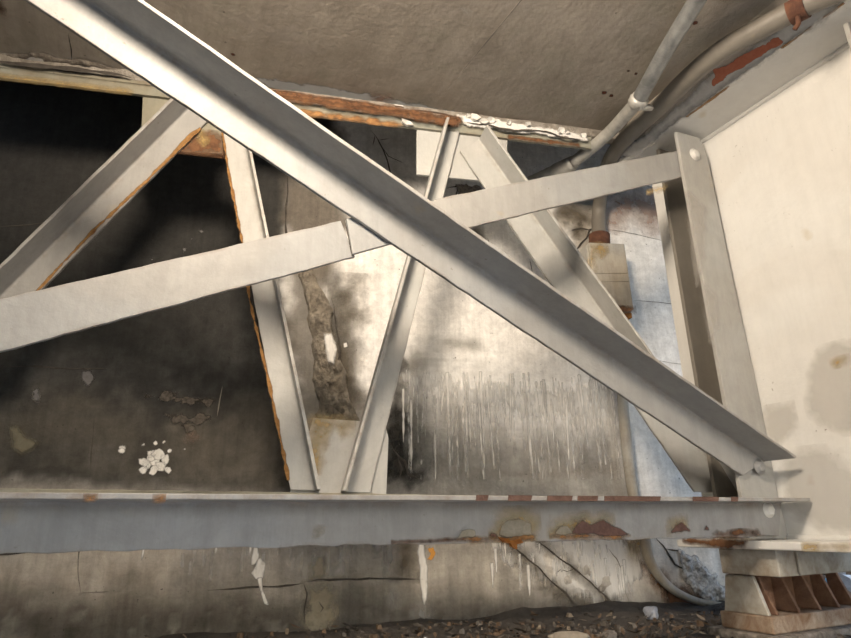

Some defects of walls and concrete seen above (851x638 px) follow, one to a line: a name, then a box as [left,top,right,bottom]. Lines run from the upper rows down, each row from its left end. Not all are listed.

corrosion [271,89,460,126]
damp [386,370,621,484]
corrosion [556,518,628,536]
corrosion [671,522,690,533]
corrosion [705,526,759,537]
spalling [678,549,725,601]
crack [216,577,413,623]